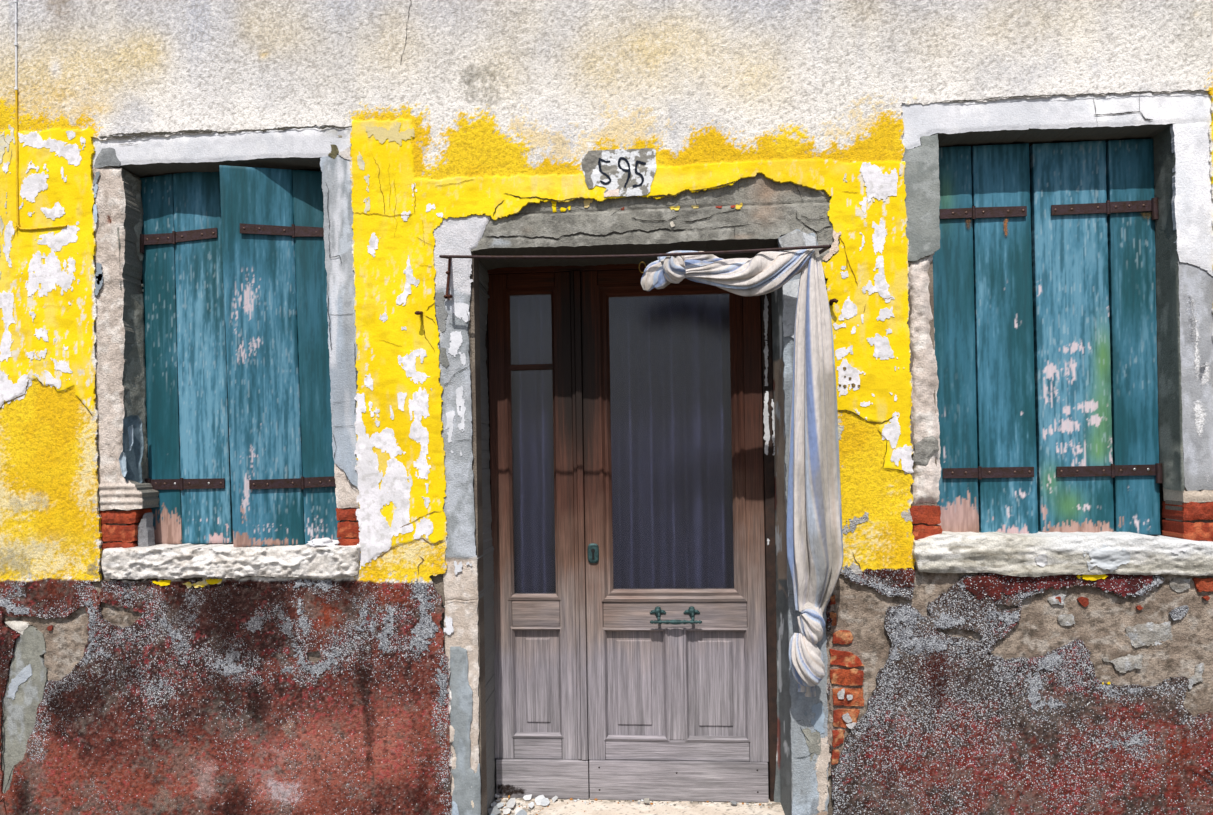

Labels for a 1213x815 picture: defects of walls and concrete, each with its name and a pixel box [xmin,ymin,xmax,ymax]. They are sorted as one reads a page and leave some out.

peeling [366,122,415,146]
spalling [328,135,370,214]
peeling [401,184,443,221]
peeling [0,125,121,408]
peeling [367,233,379,257]
peeling [379,255,420,322]
peeling [833,162,939,474]
peeling [354,292,470,569]
spalling [842,512,869,537]
flaking render [152,578,222,651]
spalling [0,580,142,793]
spalling [802,544,1213,815]